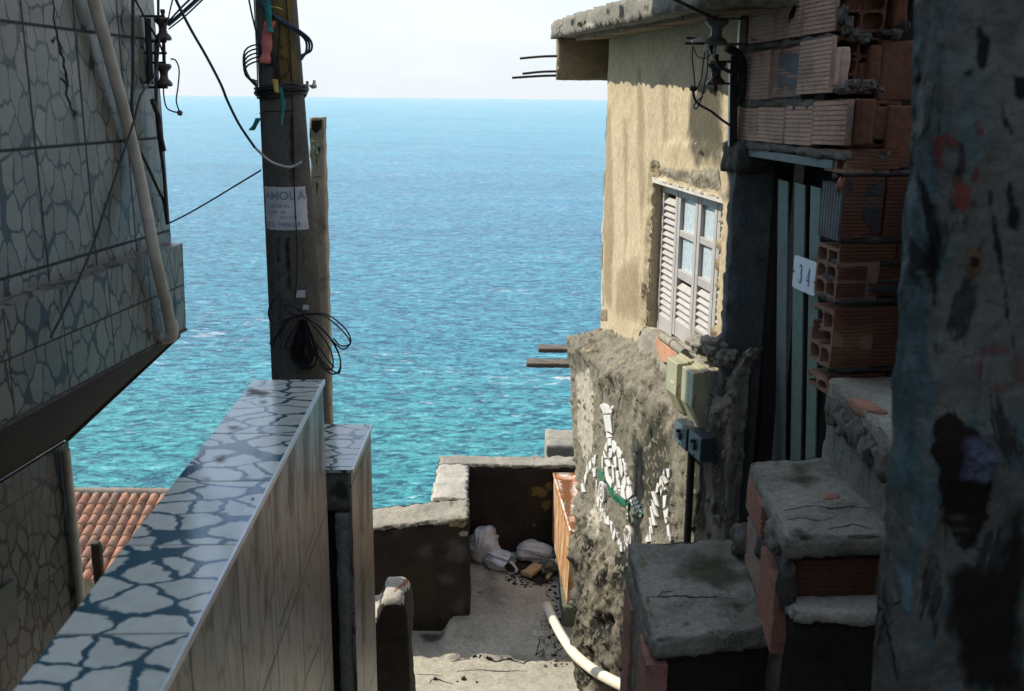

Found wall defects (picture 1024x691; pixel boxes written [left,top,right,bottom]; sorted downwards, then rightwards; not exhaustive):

crack [51,0,77,119]
crack [784,505,870,529]
crack [646,590,738,599]